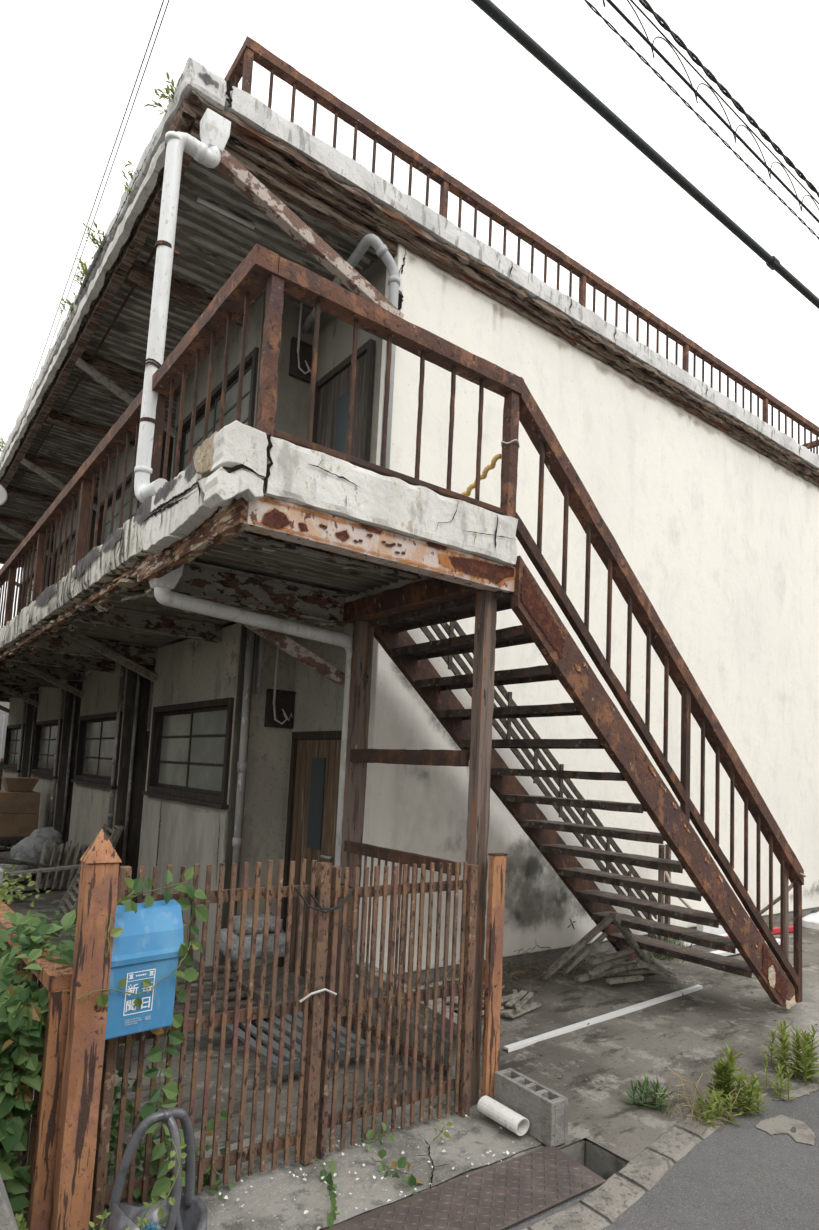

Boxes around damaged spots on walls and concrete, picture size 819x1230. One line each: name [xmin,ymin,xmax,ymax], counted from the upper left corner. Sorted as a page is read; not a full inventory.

crack [114,434,274,563]
crack [309,460,362,506]
peeling [335,524,382,541]
peeling [427,541,516,588]
spalling [45,575,155,638]
leakage [506,844,572,925]